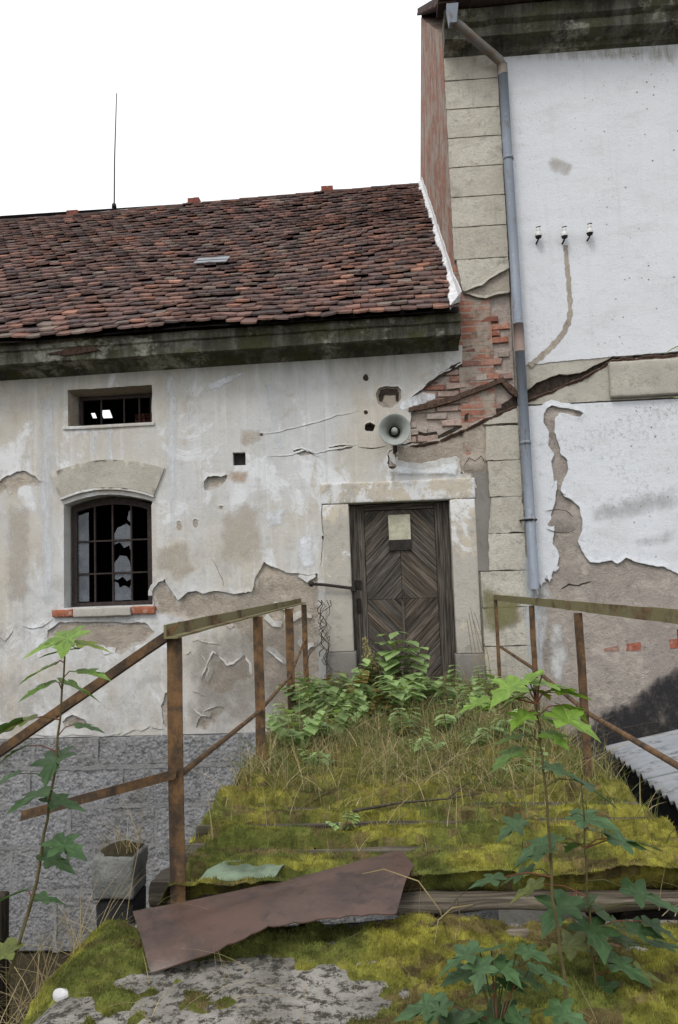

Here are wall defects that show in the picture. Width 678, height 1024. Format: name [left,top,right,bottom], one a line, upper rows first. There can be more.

flaking render [362,267,528,570]
crack [258,352,678,466]
peeling [0,465,47,496]
peeling [199,471,231,490]
peeling [530,400,678,743]
peeling [22,557,324,737]
damp [571,670,678,779]